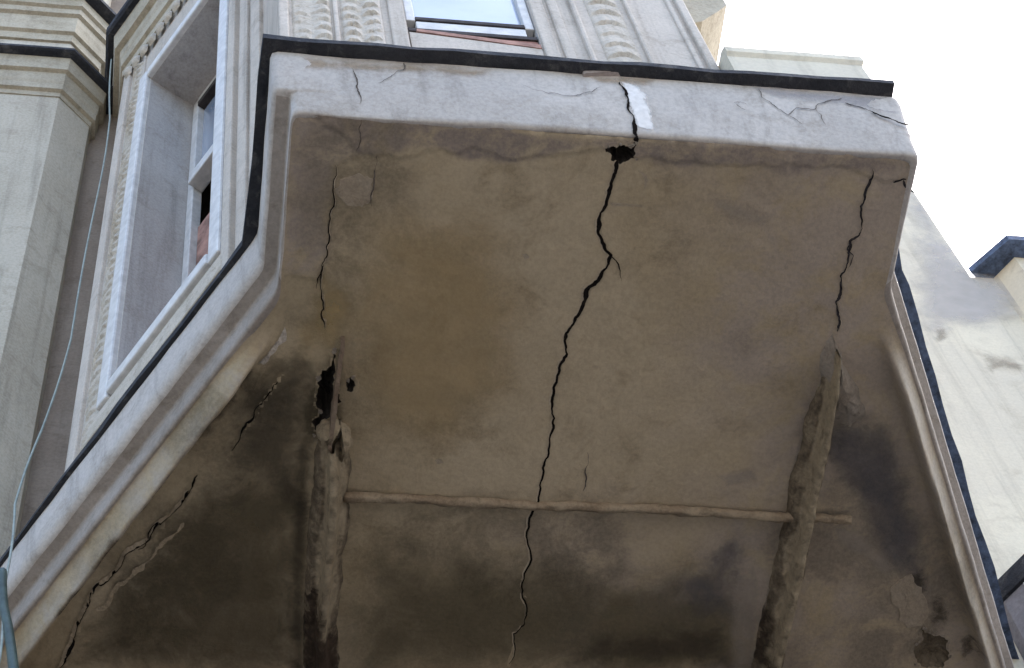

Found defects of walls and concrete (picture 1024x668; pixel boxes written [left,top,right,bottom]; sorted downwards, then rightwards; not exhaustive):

crack [734,90,910,126]
crack [316,63,406,329]
crack [835,169,914,332]
crack [232,381,278,451]
spalling [311,348,360,462]
crack [509,82,639,664]
crack [58,476,197,668]
damp [101,363,305,665]
peeling [889,574,953,668]